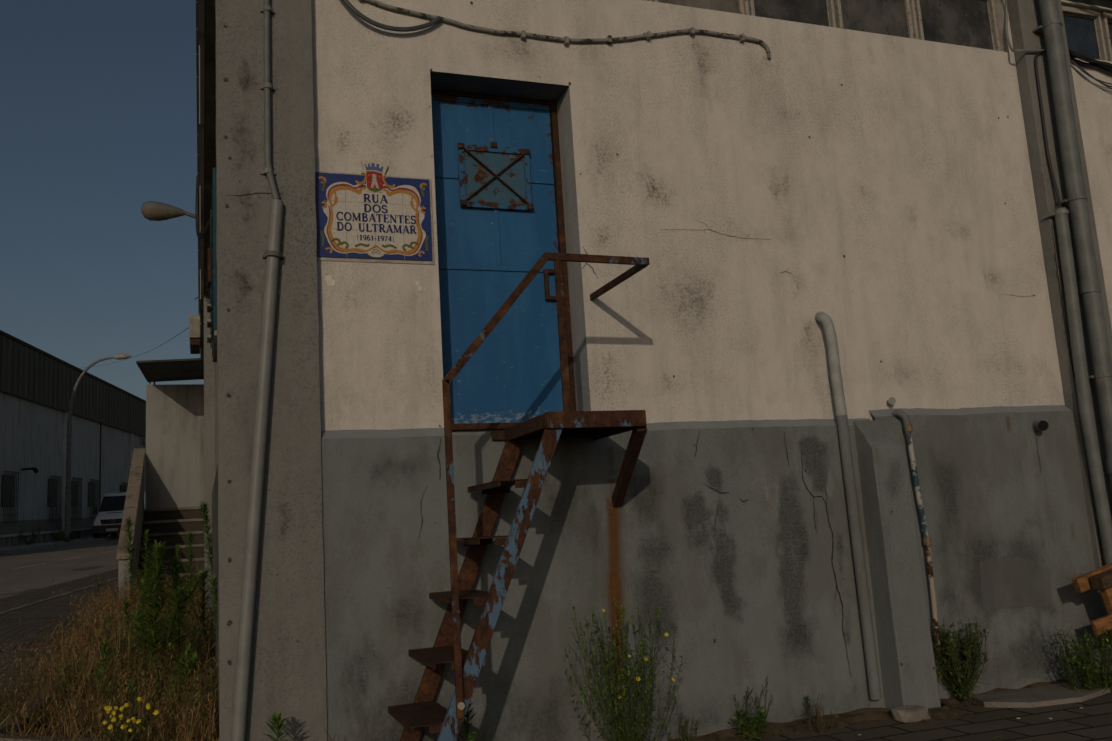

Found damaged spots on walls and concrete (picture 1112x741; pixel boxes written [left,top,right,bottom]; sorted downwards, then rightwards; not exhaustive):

crack [661,220,771,240]
rust [609,504,621,699]
crack [784,433,851,675]